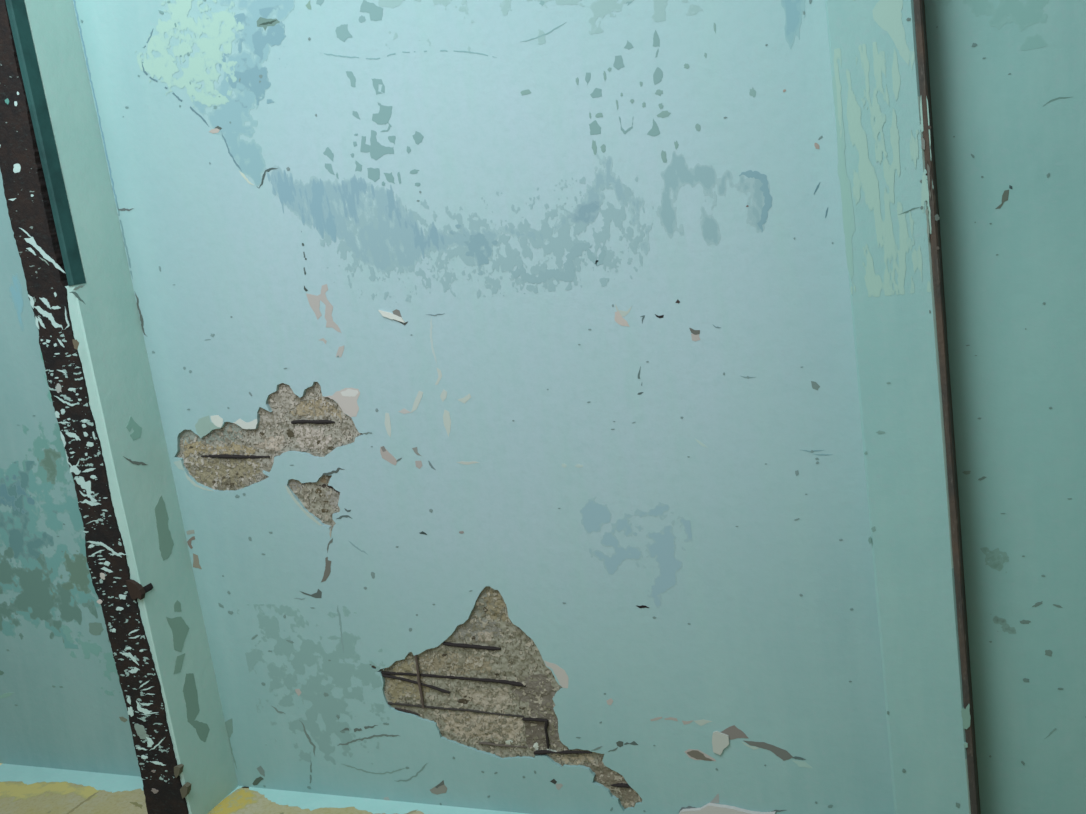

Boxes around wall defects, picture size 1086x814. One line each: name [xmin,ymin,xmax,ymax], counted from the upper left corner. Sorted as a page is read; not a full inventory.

leakage [192,0,772,303]
leakage [0,422,121,696]
spalling [174,382,363,491]
spalling [285,475,340,530]
spalling [370,586,642,809]
flaking render [650,717,812,768]